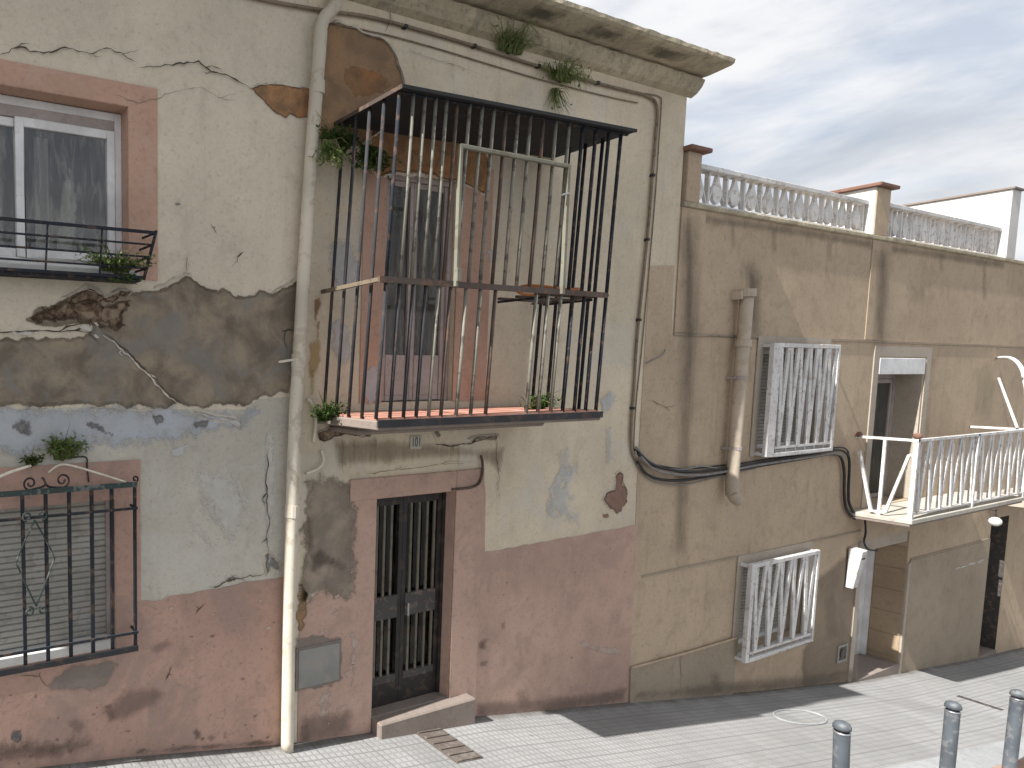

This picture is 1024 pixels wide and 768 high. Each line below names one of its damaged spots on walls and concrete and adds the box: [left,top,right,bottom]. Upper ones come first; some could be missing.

crack [0,43,253,103]
spalling [251,81,309,118]
spalling [318,19,488,195]
crack [0,323,181,404]
spalling [0,272,297,458]
crack [196,454,270,613]
peeling [296,477,357,631]
spalling [602,470,628,518]